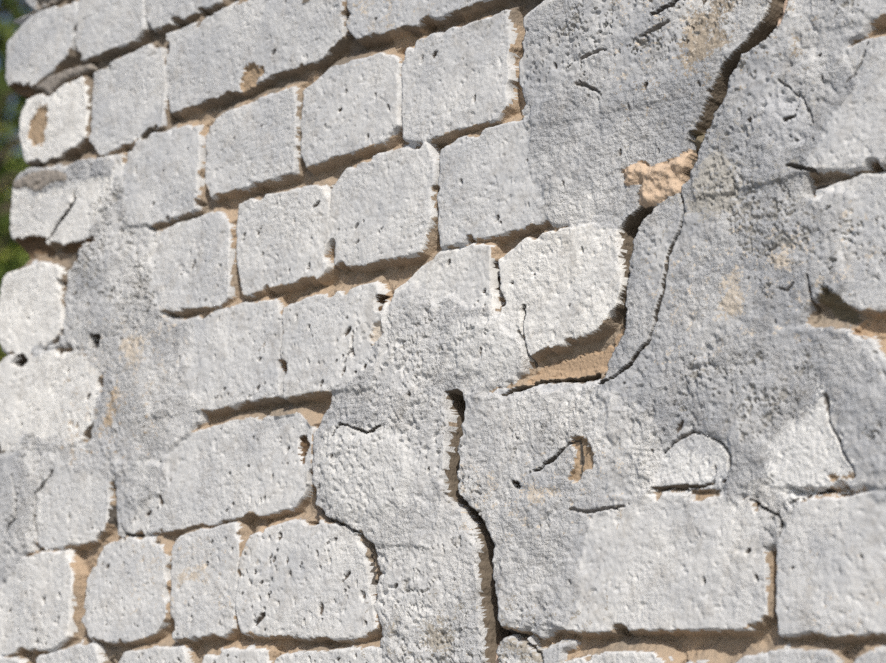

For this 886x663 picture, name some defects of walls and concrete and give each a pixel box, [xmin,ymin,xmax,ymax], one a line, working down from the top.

spalling [239,62,265,94]
peeling [8,64,100,147]
crack [46,196,77,241]
crack [501,0,785,396]
crack [530,439,585,477]
crack [666,429,732,467]
crack [823,392,856,477]
crack [652,483,715,491]
crack [443,389,544,663]
crack [750,488,837,534]